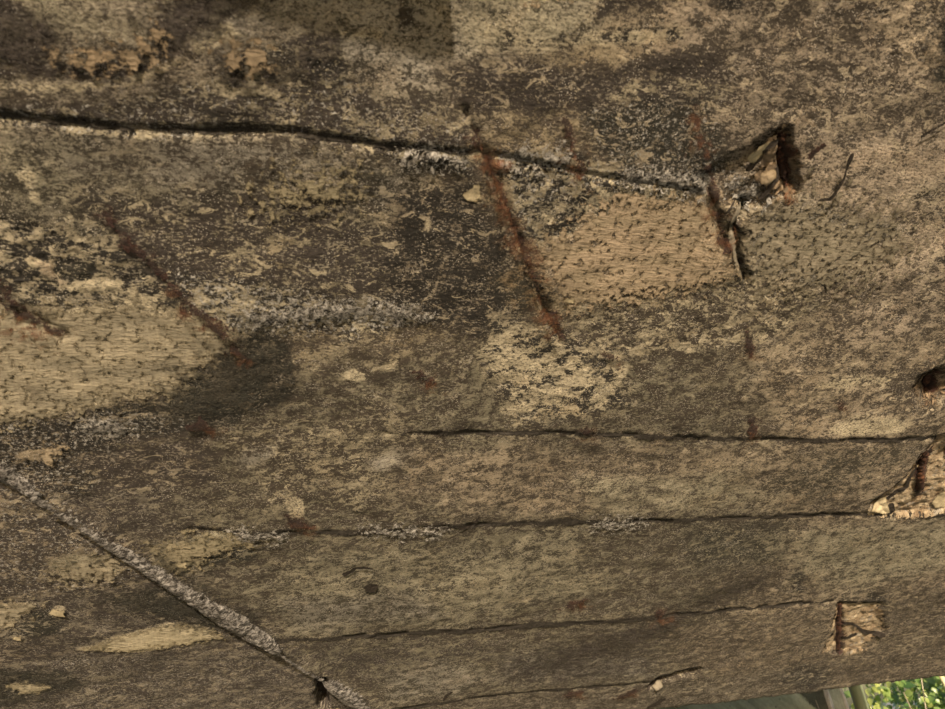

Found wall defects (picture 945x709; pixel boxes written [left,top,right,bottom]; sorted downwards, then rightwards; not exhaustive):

rust [463,126,566,339]
rust [687,104,736,254]
peeling [525,118,945,318]
rust [0,279,69,344]
spalling [866,434,945,522]
crack [459,517,480,531]
crack [342,567,378,593]
spalling [822,602,891,657]